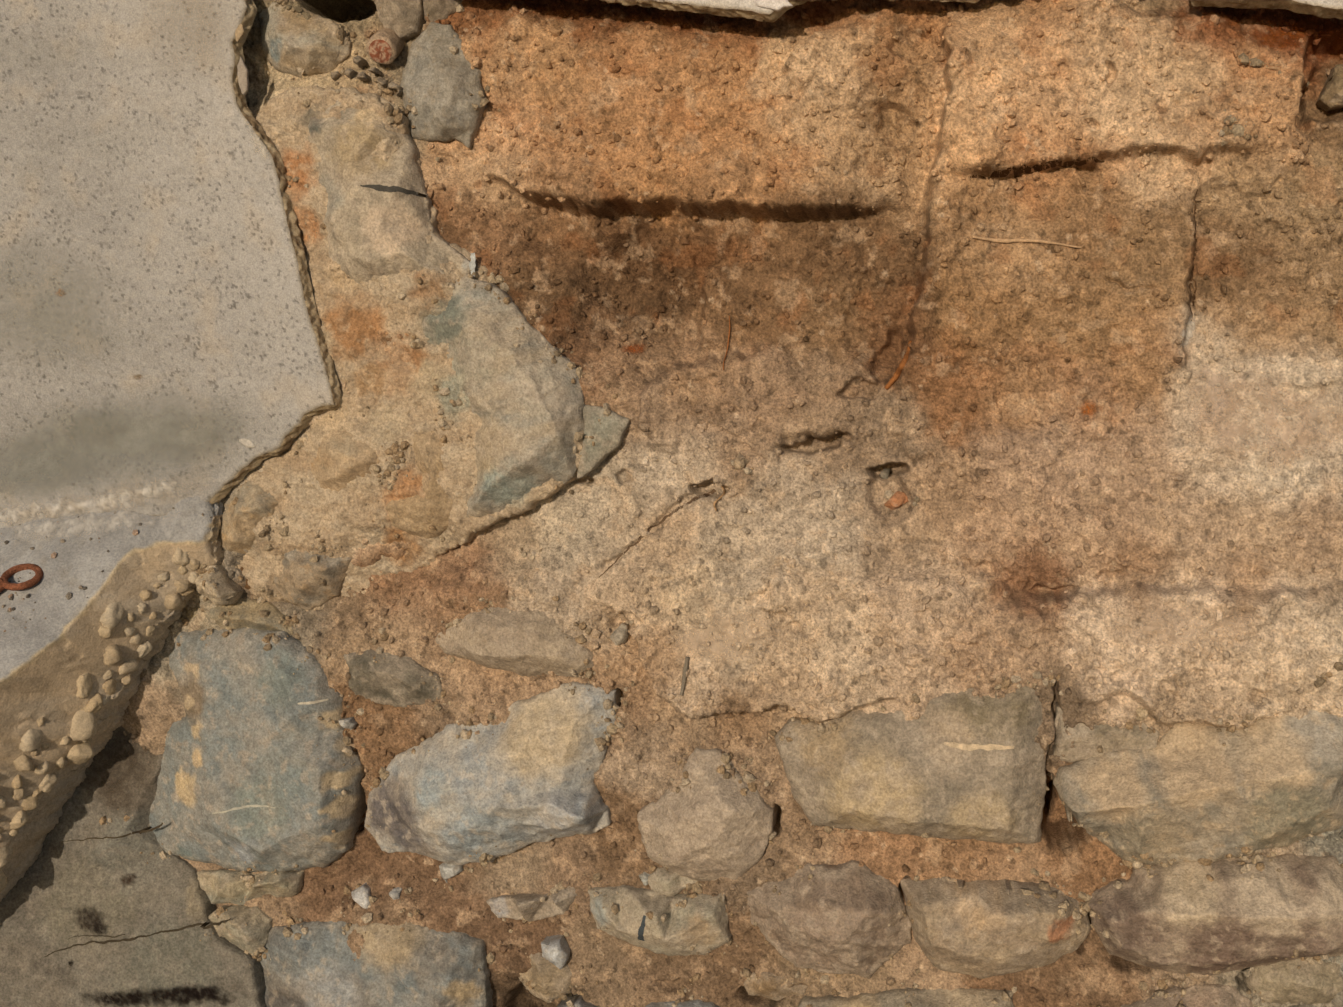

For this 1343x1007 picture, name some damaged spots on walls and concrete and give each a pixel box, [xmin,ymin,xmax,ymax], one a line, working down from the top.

flaking render [754,0,793,11]
flaking render [235,24,249,95]
spalling [360,184,427,198]
spalling [610,622,630,646]
spalling [338,717,358,730]
spalling [944,742,1014,751]
spalling [212,805,275,814]
spalling [439,862,464,883]
spalling [351,882,371,909]
spalling [389,887,402,900]
spalling [638,915,646,941]
spalling [541,935,570,969]